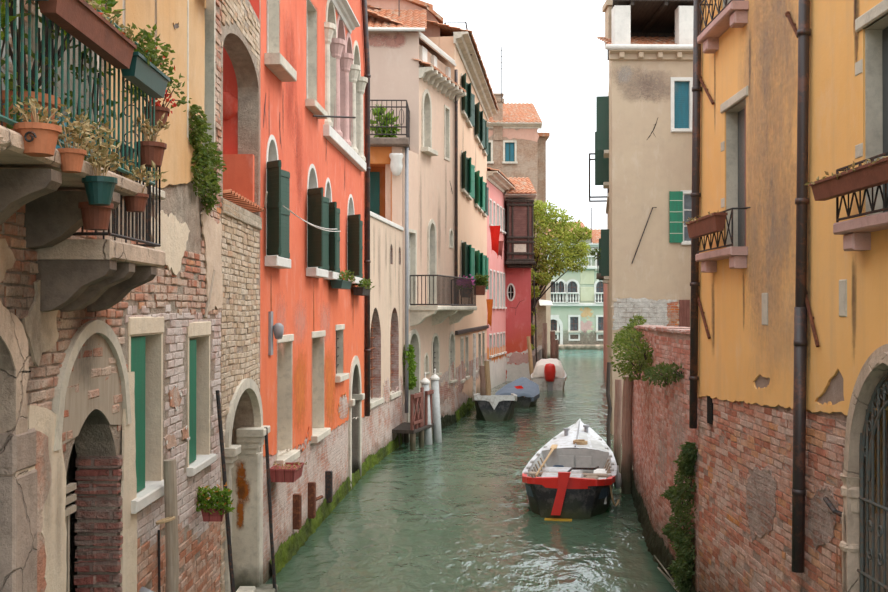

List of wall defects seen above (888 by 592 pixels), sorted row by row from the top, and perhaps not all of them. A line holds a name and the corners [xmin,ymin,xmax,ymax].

flaking render [755,375,770,389]
flaking render [817,371,844,405]
corrosion [236,462,250,528]
spalling [745,466,777,543]
spalling [808,485,839,553]